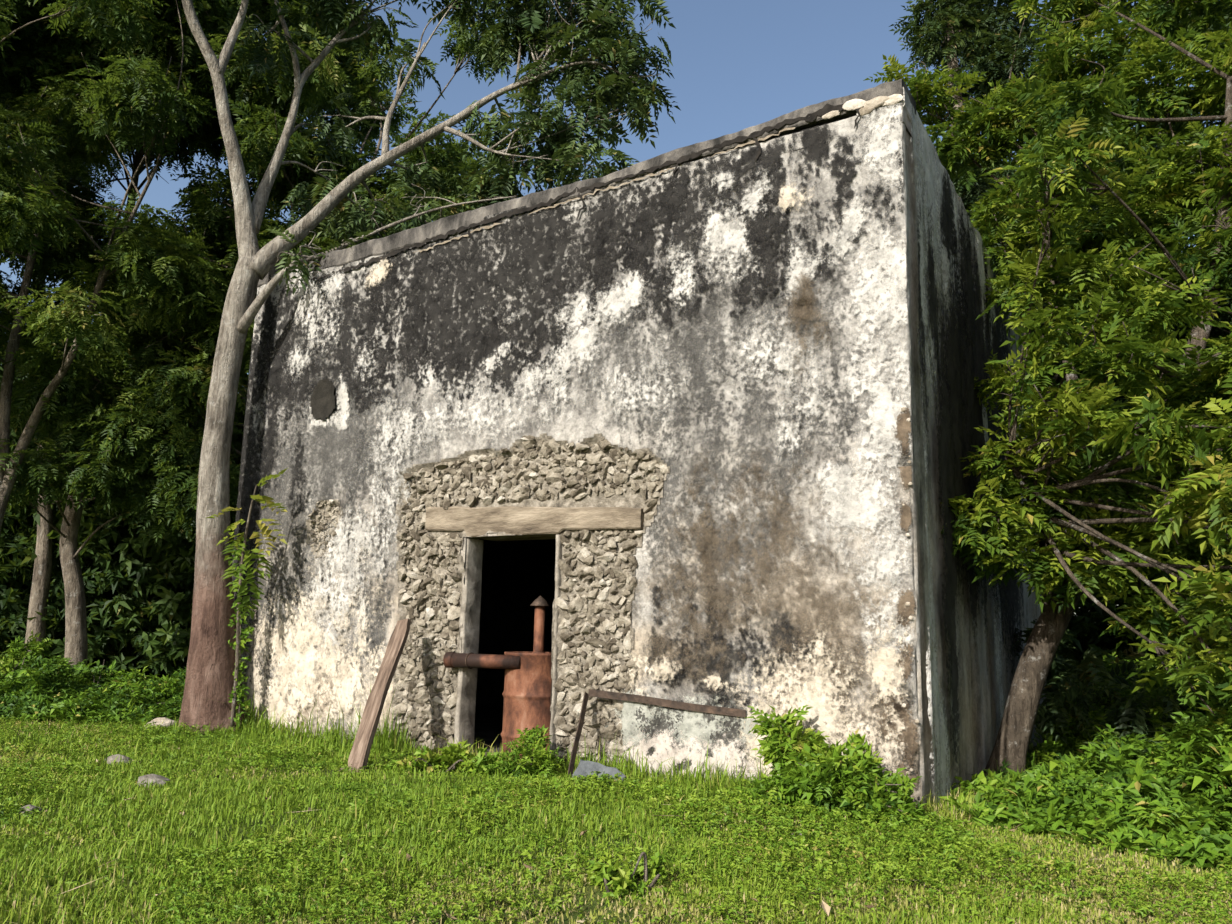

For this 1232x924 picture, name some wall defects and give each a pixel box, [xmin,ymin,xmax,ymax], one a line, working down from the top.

flaking render [241,104,984,790]
damp [231,122,1025,808]